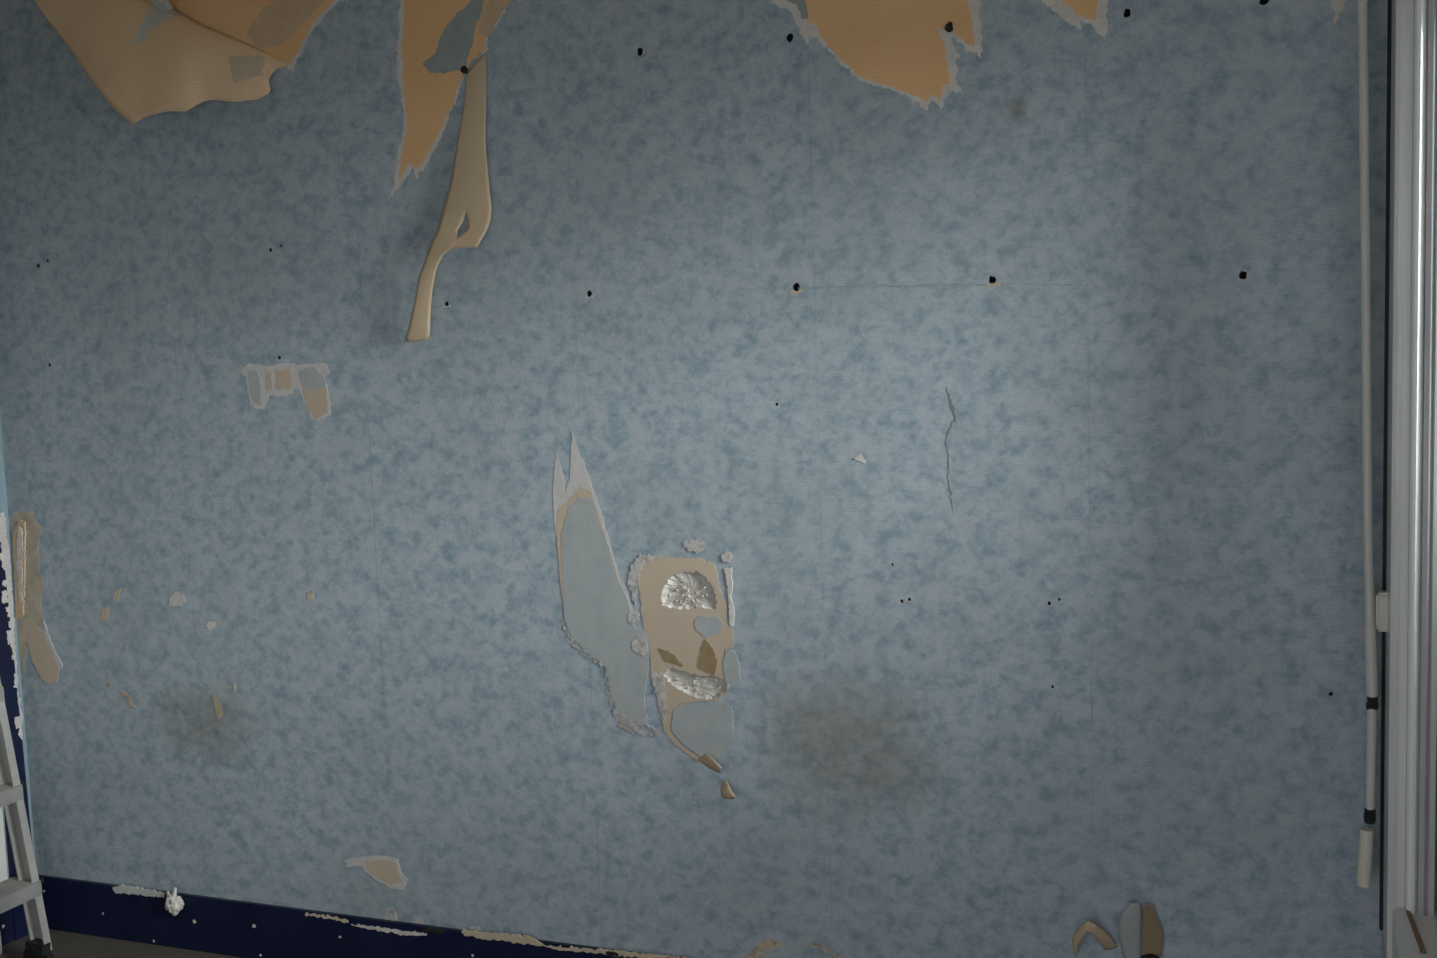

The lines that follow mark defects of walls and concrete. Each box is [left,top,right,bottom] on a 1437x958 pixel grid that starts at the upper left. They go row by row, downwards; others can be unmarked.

peeling [240,363,331,423]
crack [945,387,957,507]
peeling [553,432,740,762]
peeling [345,855,408,890]
flaking render [112,884,166,898]
flaking render [305,908,444,938]
flaking render [461,926,686,958]